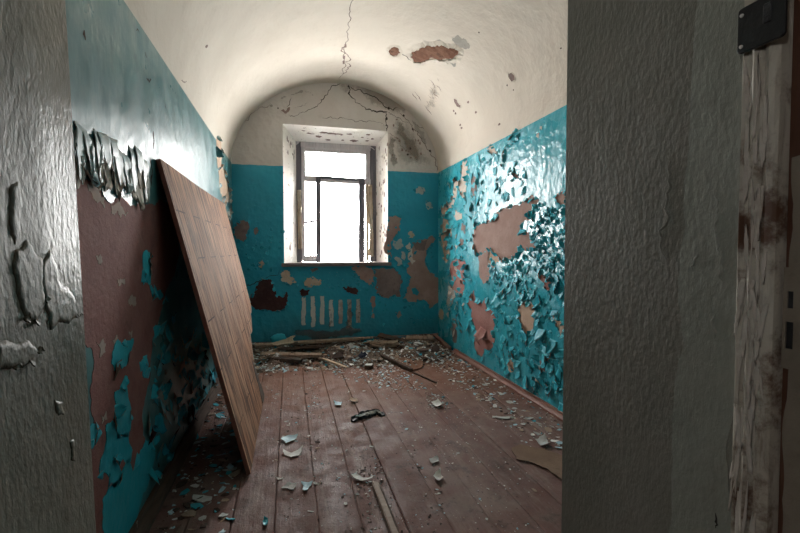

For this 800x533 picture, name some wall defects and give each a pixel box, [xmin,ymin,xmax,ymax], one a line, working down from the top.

crack [241,0,438,170]
flaking render [386,35,470,67]
peeling [73,121,218,533]
peeling [216,135,324,312]
peeling [300,128,566,412]
peeling [179,488,229,521]